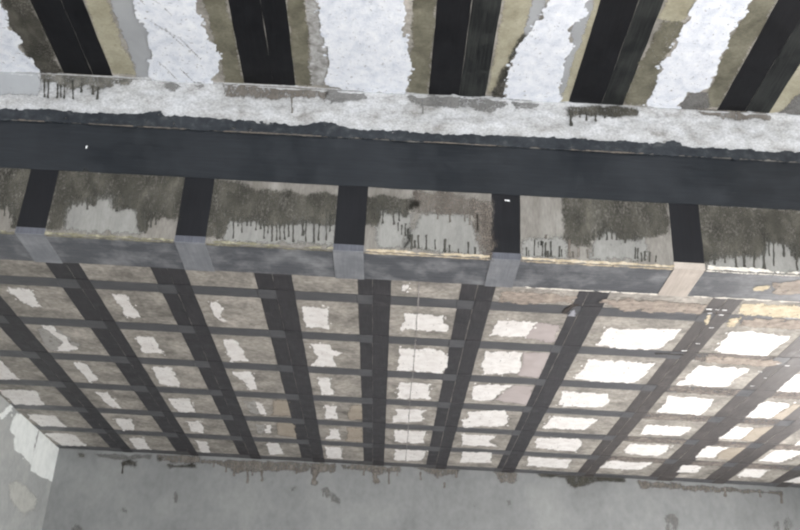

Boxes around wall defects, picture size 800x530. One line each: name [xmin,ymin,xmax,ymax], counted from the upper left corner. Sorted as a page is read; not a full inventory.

peeling [0,4,40,73]
peeling [133,0,223,84]
peeling [314,0,415,94]
peeling [503,0,589,103]
peeling [643,0,752,109]
damp [0,108,800,163]
damp [567,104,639,126]
damp [46,170,185,233]
damp [206,179,338,243]
damp [525,198,670,262]
damp [699,205,800,271]
peeling [0,361,87,482]